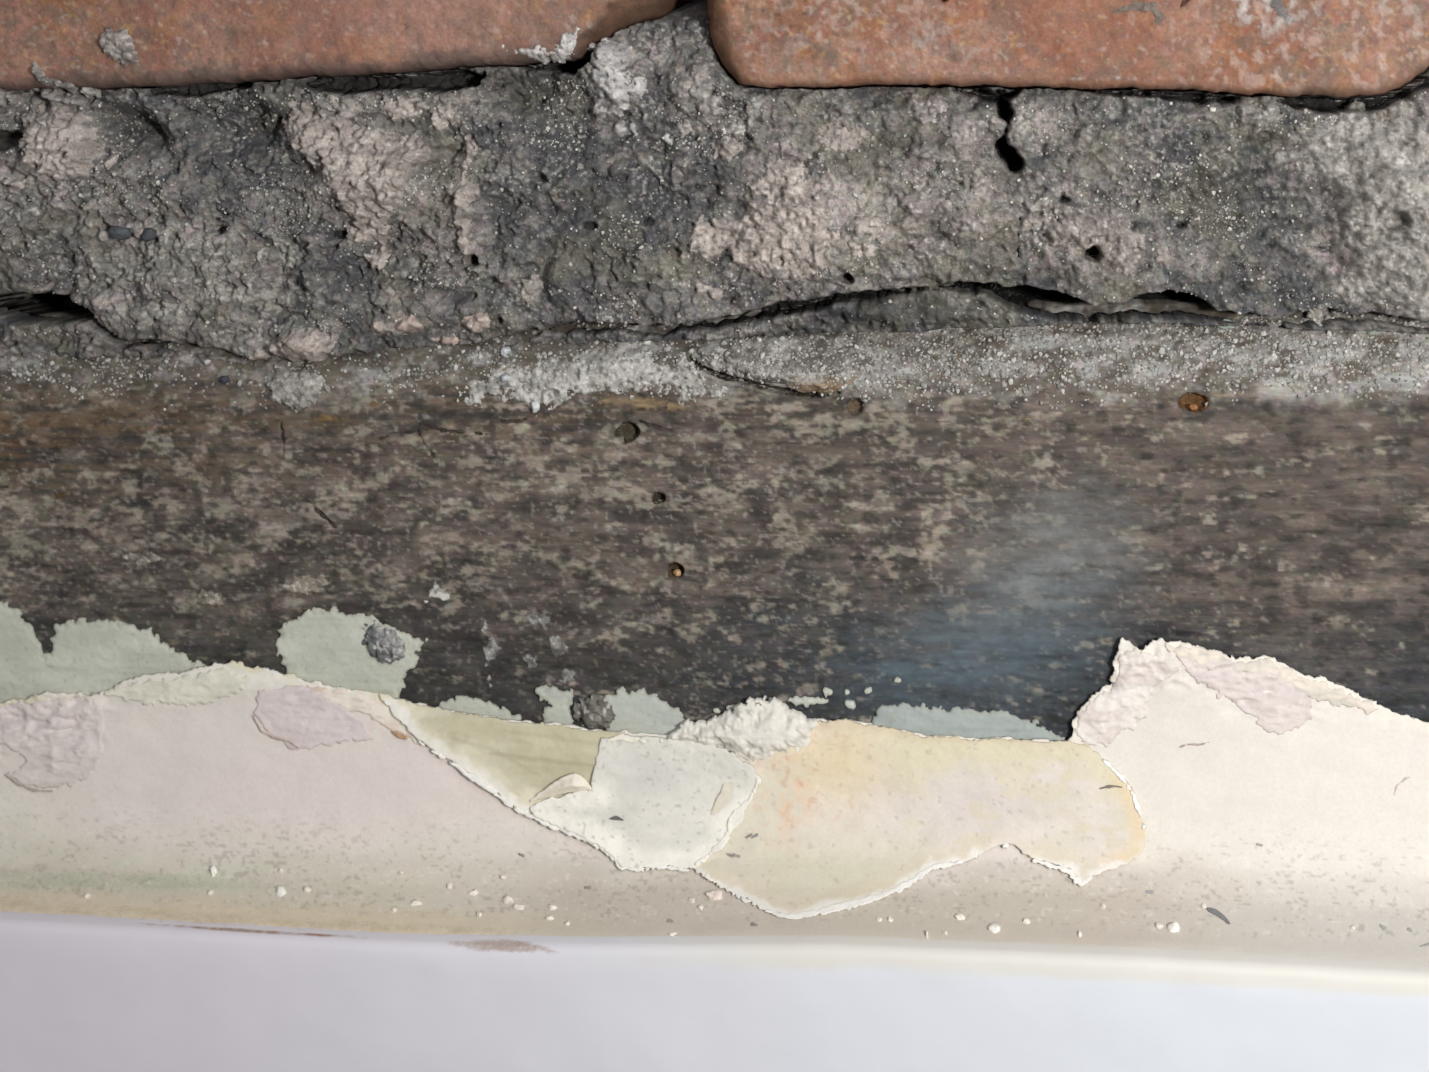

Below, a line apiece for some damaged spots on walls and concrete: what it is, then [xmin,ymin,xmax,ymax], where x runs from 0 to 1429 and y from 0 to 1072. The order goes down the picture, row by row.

crack [1094,90,1238,104]
crack [1277,78,1429,113]
crack [956,87,1023,171]
crack [123,337,162,345]
crack [522,322,637,332]
crack [672,217,1224,398]
peeling [0,601,206,703]
peeling [275,574,428,698]
peeling [438,664,522,721]
peeling [535,669,575,724]
peeling [605,686,690,735]
peeling [768,687,1065,741]